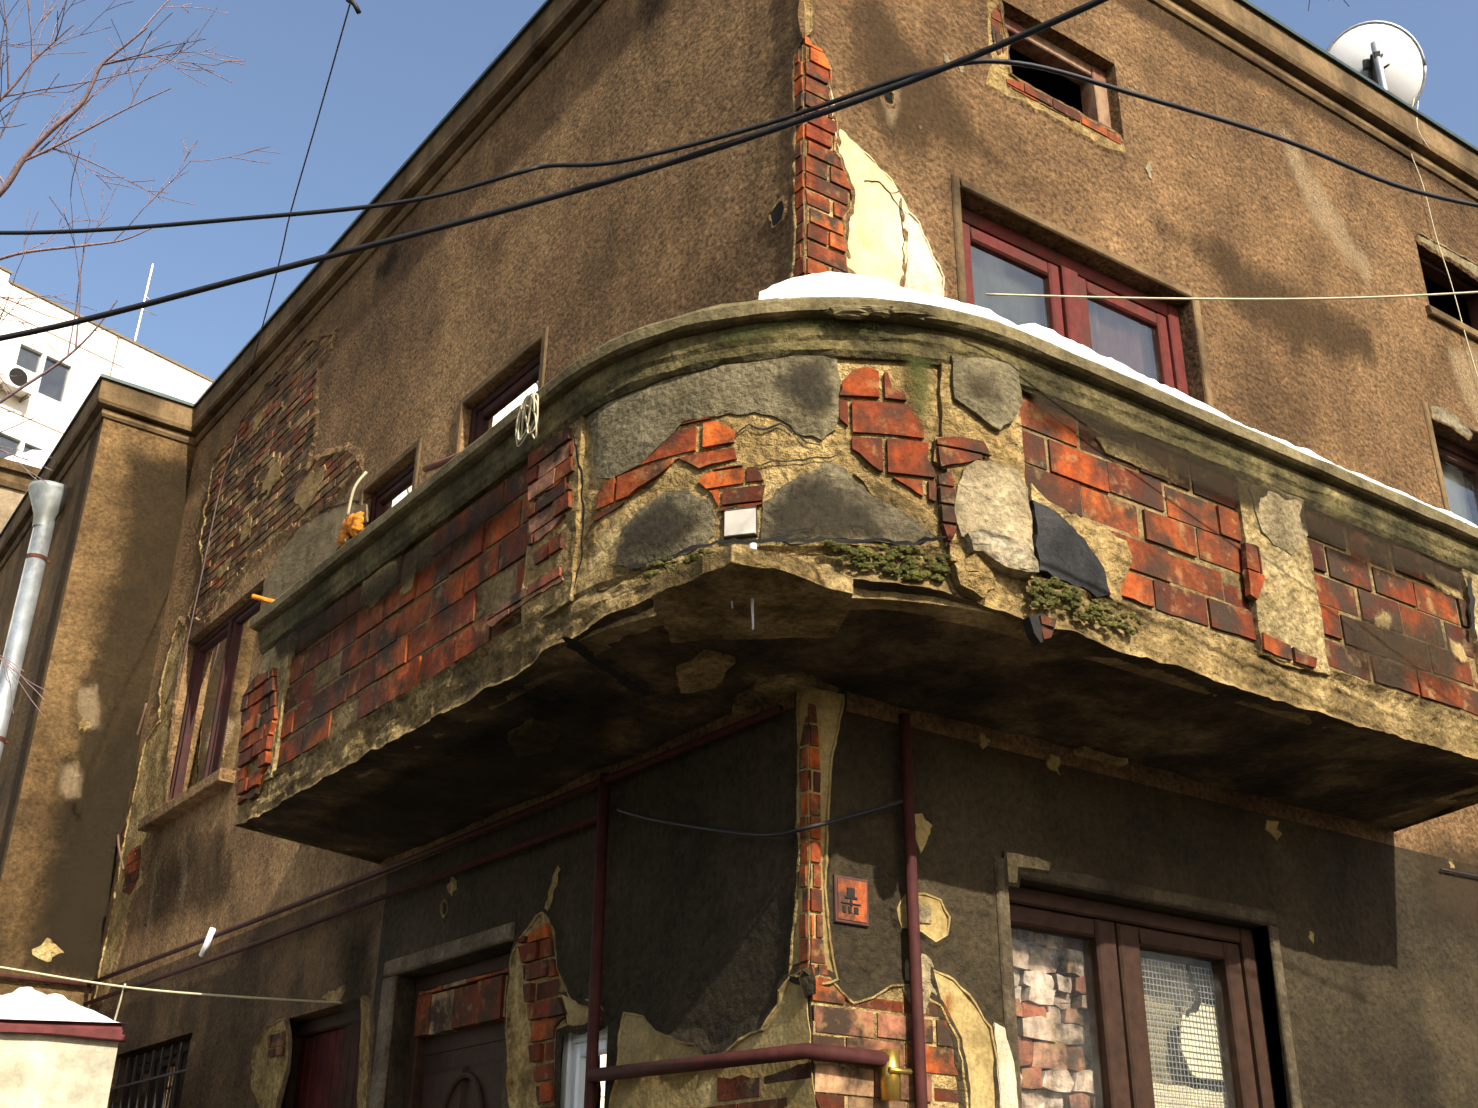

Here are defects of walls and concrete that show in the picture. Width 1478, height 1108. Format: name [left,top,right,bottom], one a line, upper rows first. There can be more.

flaking render [785,0,951,299]
water stain [859,0,974,153]
flaking render [982,0,1129,157]
water stain [1194,240,1371,356]
spalling [485,355,1133,694]
flaking render [1094,437,1170,484]
flaking render [1240,484,1308,602]
flaking render [93,321,364,1007]
flaking render [1261,632,1317,672]
flaking render [32,938,64,962]
peeling [414,672,1018,1108]
peeling [251,1011,292,1108]